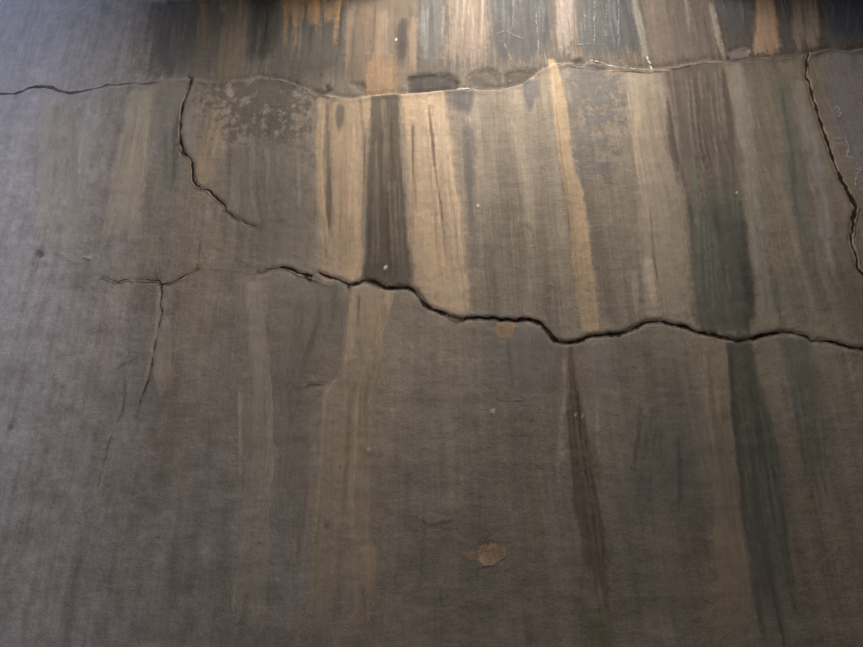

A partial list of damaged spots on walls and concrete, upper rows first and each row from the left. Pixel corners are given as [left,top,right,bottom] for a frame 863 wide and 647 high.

crack [0,76,330,234]
water stain [491,0,774,333]
crack [558,49,863,275]
crack [53,242,863,486]
water stain [566,346,610,608]